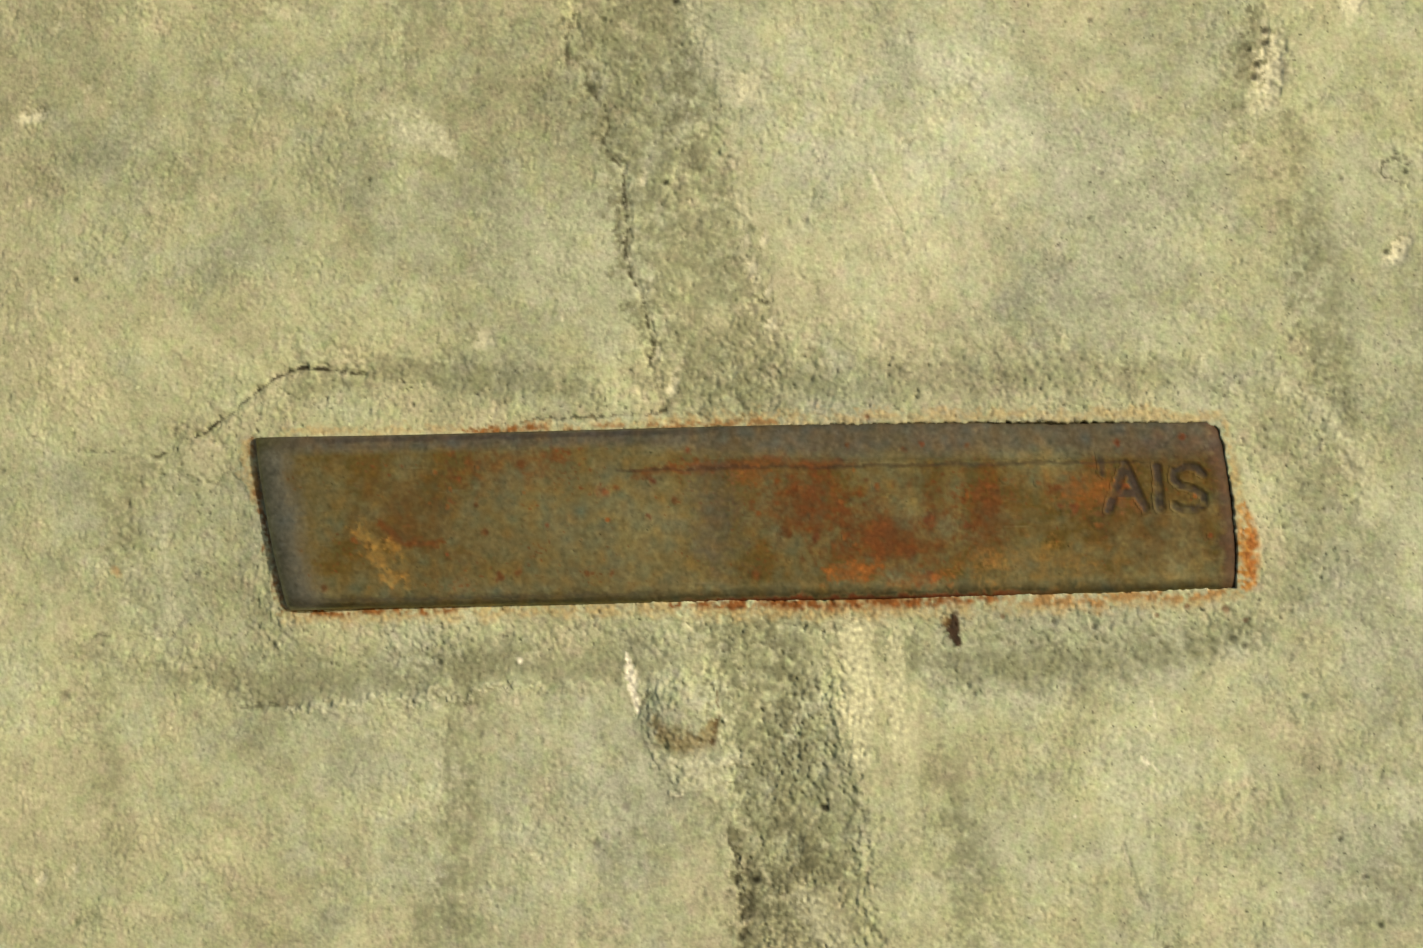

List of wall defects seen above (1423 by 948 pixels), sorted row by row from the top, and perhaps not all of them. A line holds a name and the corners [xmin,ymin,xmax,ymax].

crack [528,0,670,422]
crack [68,363,435,461]
corrosion [233,399,1266,666]
crack [727,836,760,948]